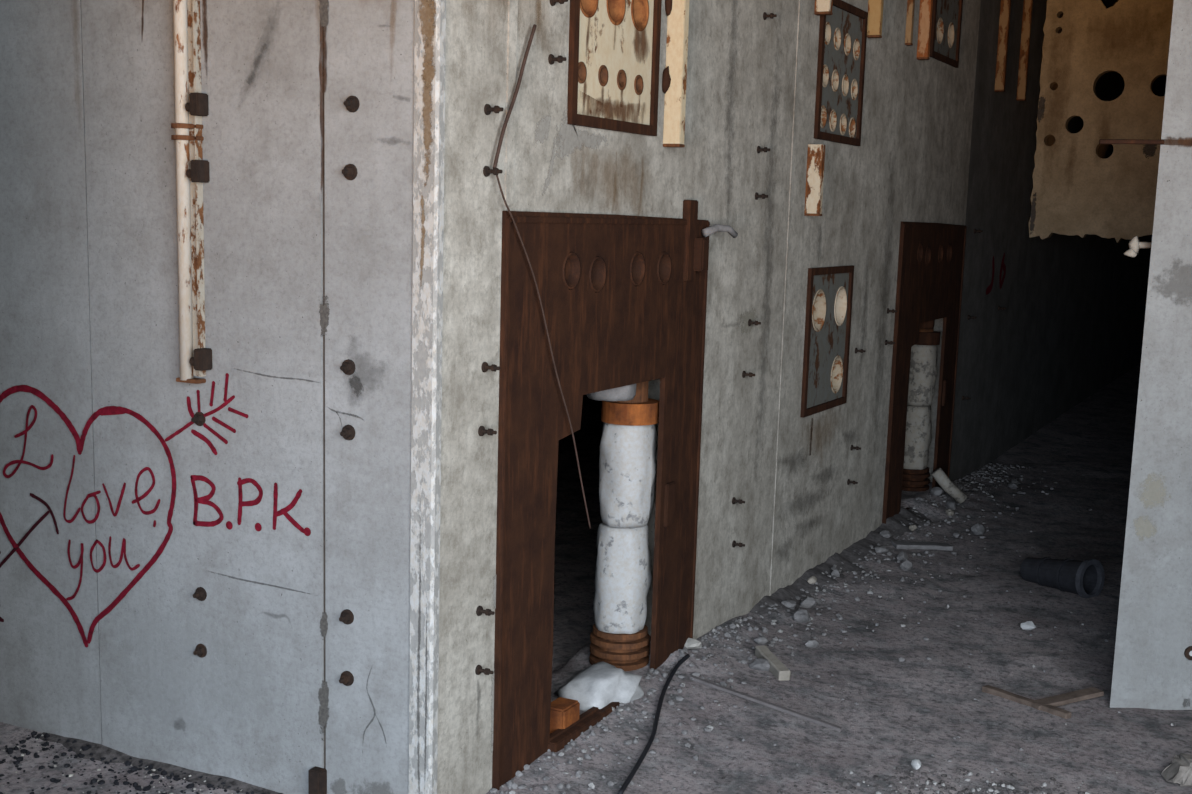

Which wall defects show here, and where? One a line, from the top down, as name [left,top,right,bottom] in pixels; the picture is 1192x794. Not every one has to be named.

peeling [419,0,436,280]
rust [1169,137,1192,147]